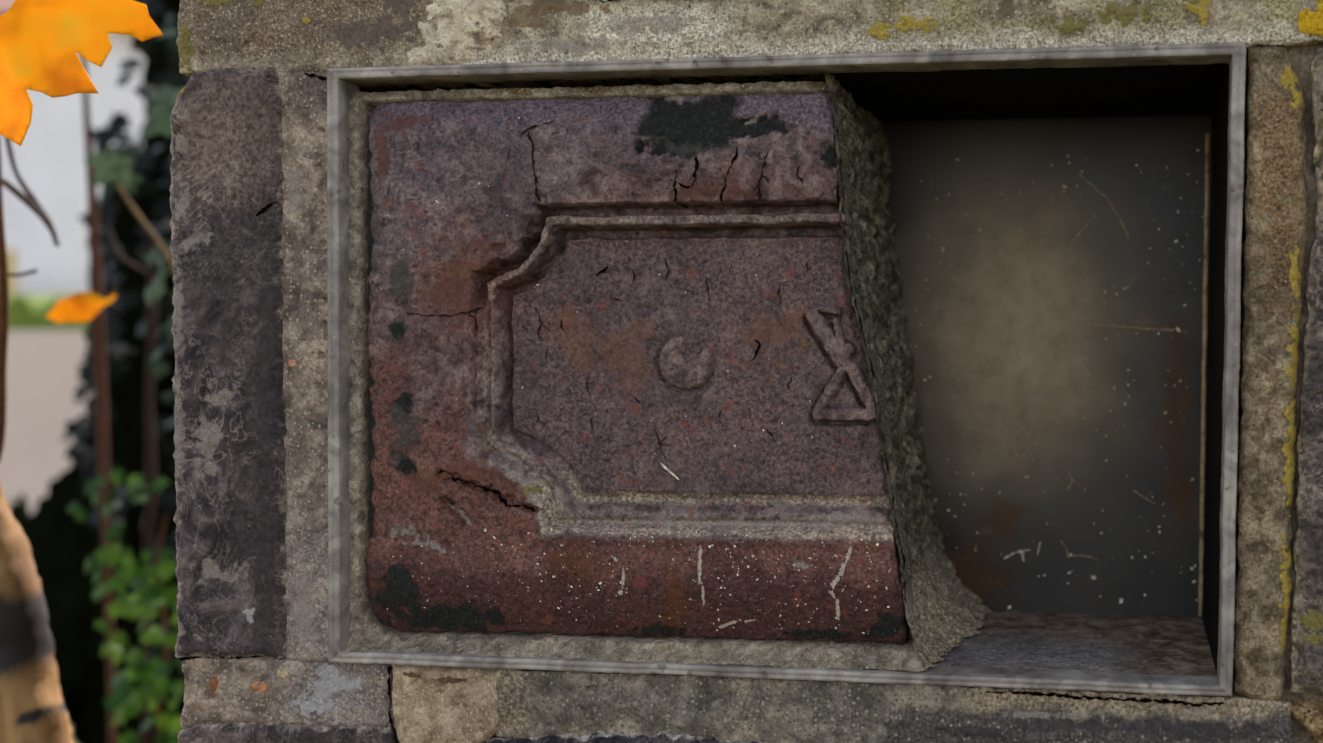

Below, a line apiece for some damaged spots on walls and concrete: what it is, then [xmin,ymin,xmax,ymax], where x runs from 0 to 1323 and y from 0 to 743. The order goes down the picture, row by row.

crack [520,121,556,212]
crack [673,146,803,209]
crack [433,469,535,512]
damp [376,564,504,632]